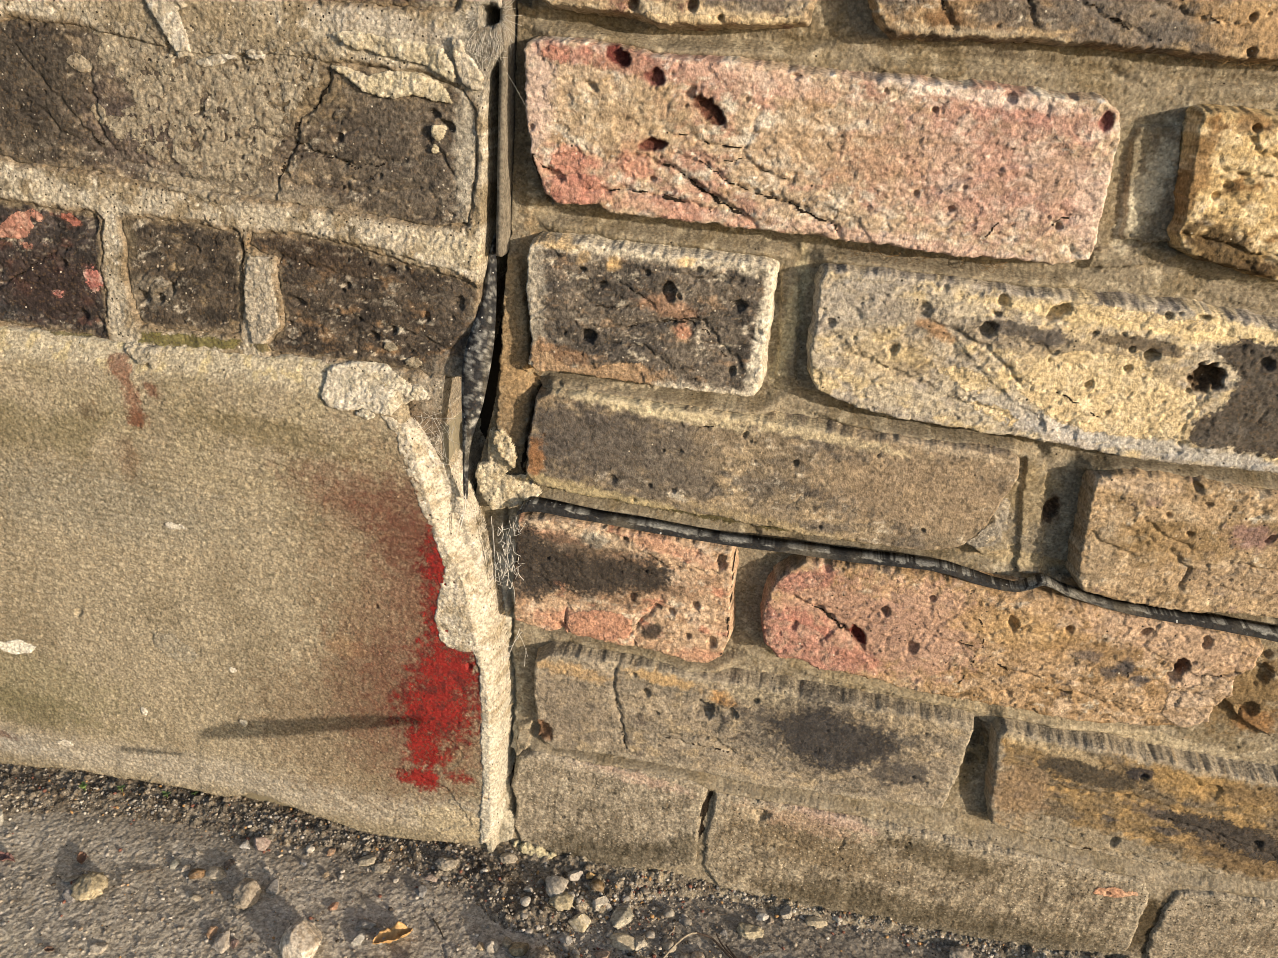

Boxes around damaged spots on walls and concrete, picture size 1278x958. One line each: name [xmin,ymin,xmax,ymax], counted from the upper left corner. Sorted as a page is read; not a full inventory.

crack [589,132,838,231]
peeling [410,384,430,401]
crack [796,597,852,636]
crack [698,791,713,839]